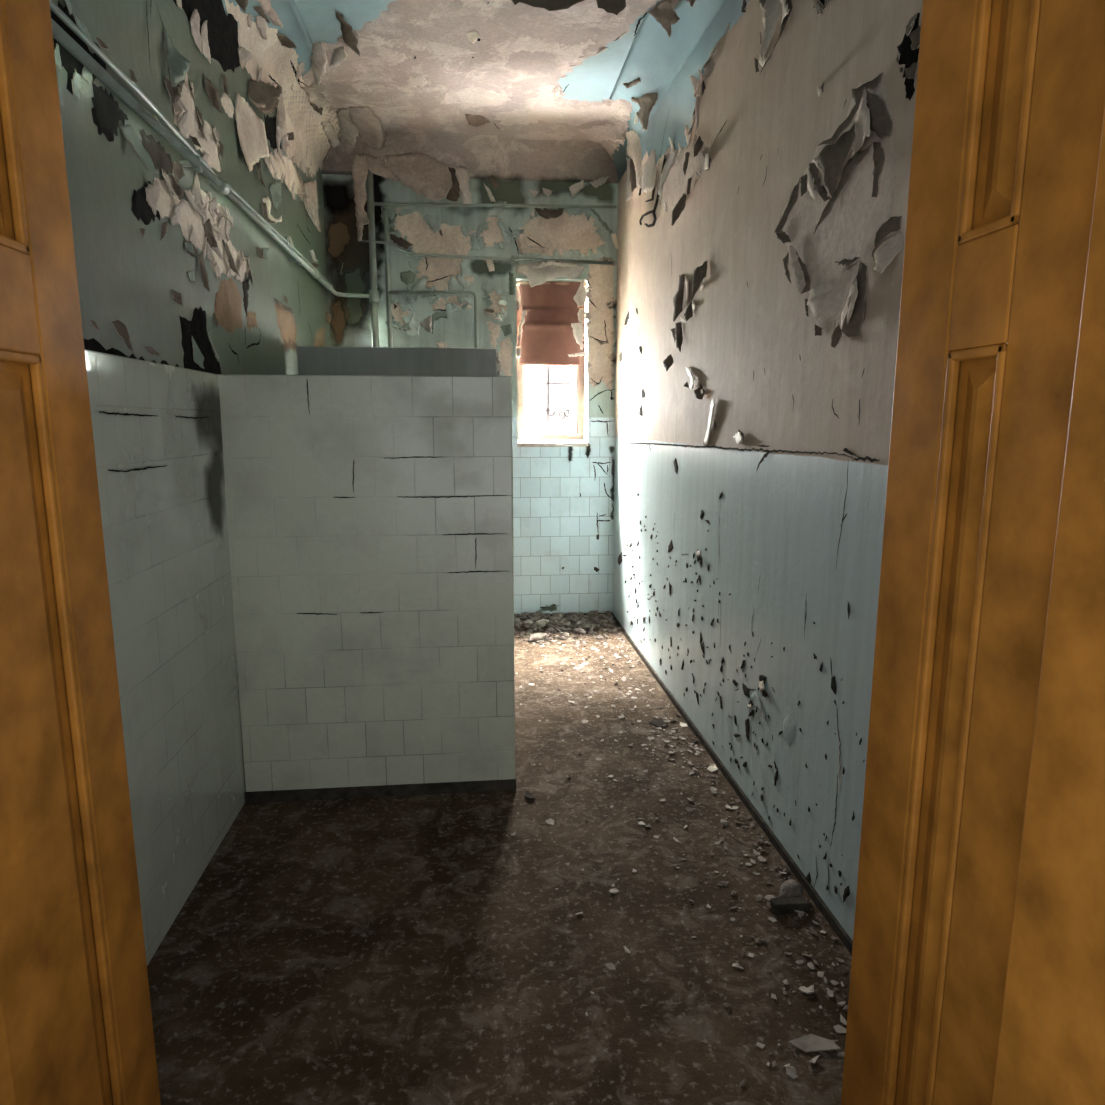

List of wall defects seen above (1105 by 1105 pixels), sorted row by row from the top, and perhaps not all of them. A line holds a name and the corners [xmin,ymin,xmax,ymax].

peeling [50,0,270,374]
peeling [146,0,793,268]
peeling [774,72,903,348]
spalling [896,13,921,100]
water stain [197,392,223,527]
peeling [381,202,645,444]
peeling [663,260,717,445]
peeling [733,430,744,445]
spalling [618,516,783,769]
spalling [752,761,791,826]
spalling [819,833,850,902]